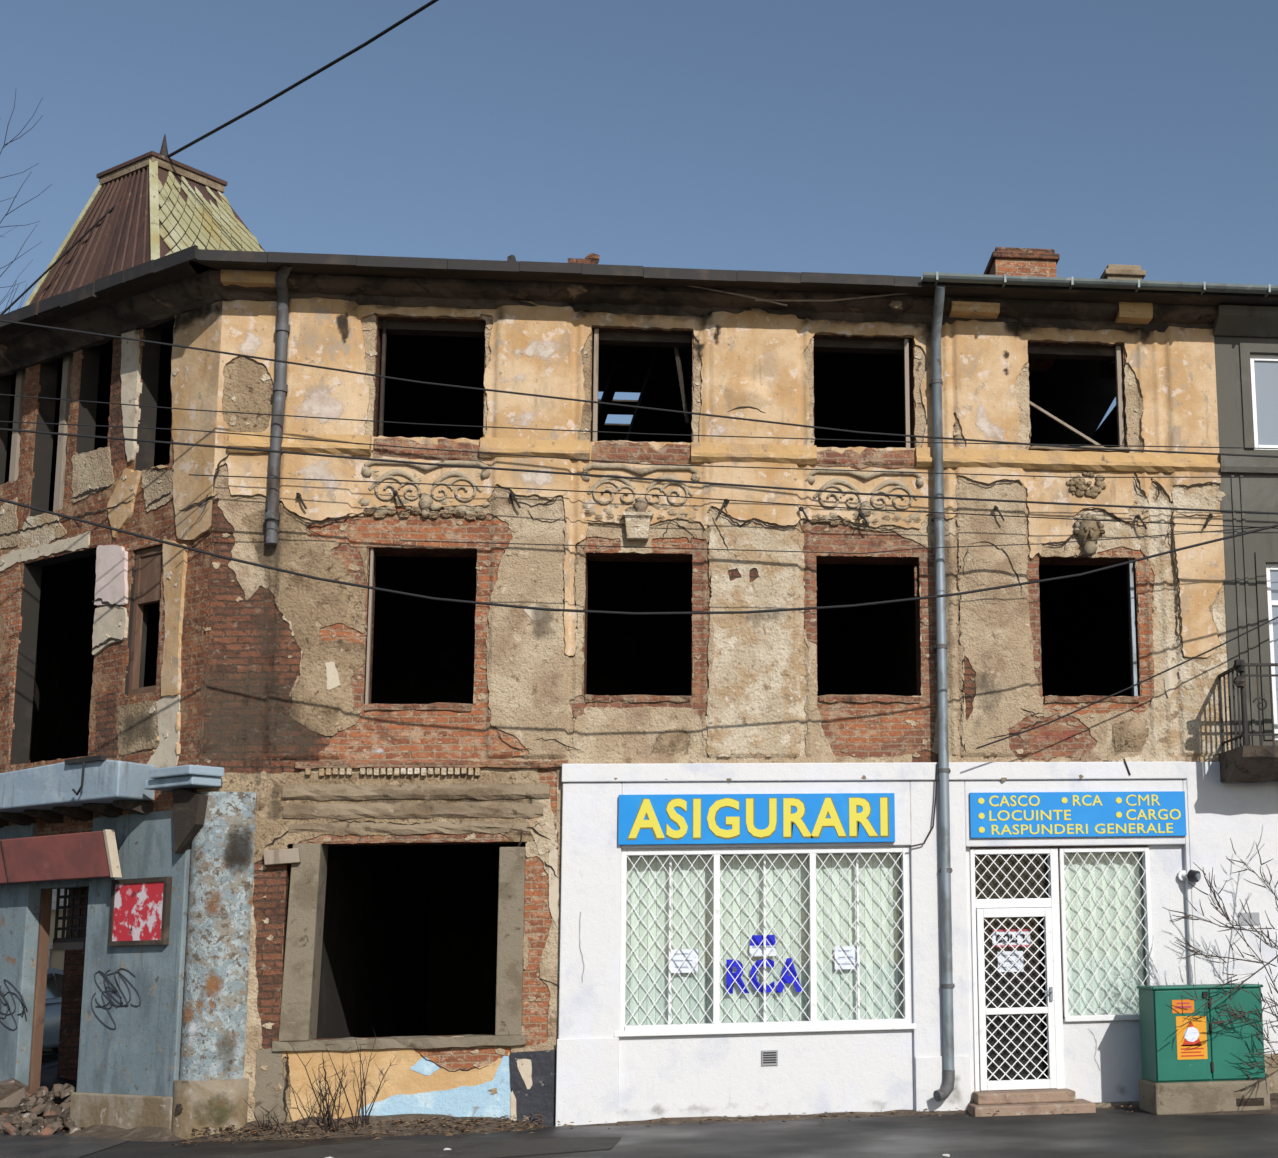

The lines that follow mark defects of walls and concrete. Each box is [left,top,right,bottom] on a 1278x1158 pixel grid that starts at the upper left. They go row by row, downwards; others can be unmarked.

flaking render [109,336,125,465]
peeling [300,461,338,491]
flaking render [124,538,165,551]
flaking render [0,567,22,761]
flaking render [95,690,118,759]
flaking render [159,561,177,681]
flaking render [197,469,1231,784]
flaking render [300,833,514,844]
flaking render [253,859,291,1123]
flaking render [360,769,560,1121]